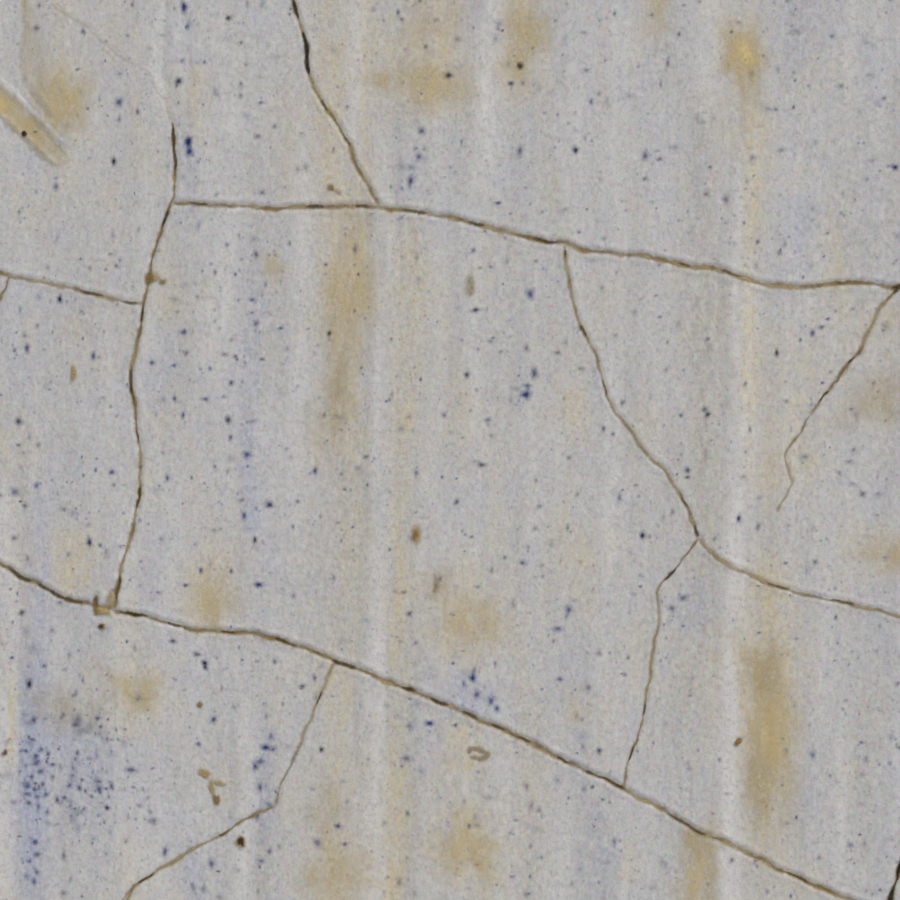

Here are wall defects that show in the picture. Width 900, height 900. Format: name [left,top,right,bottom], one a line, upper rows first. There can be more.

crack [0,271,855,900]
crack [148,0,900,617]
crack [888,863,900,900]